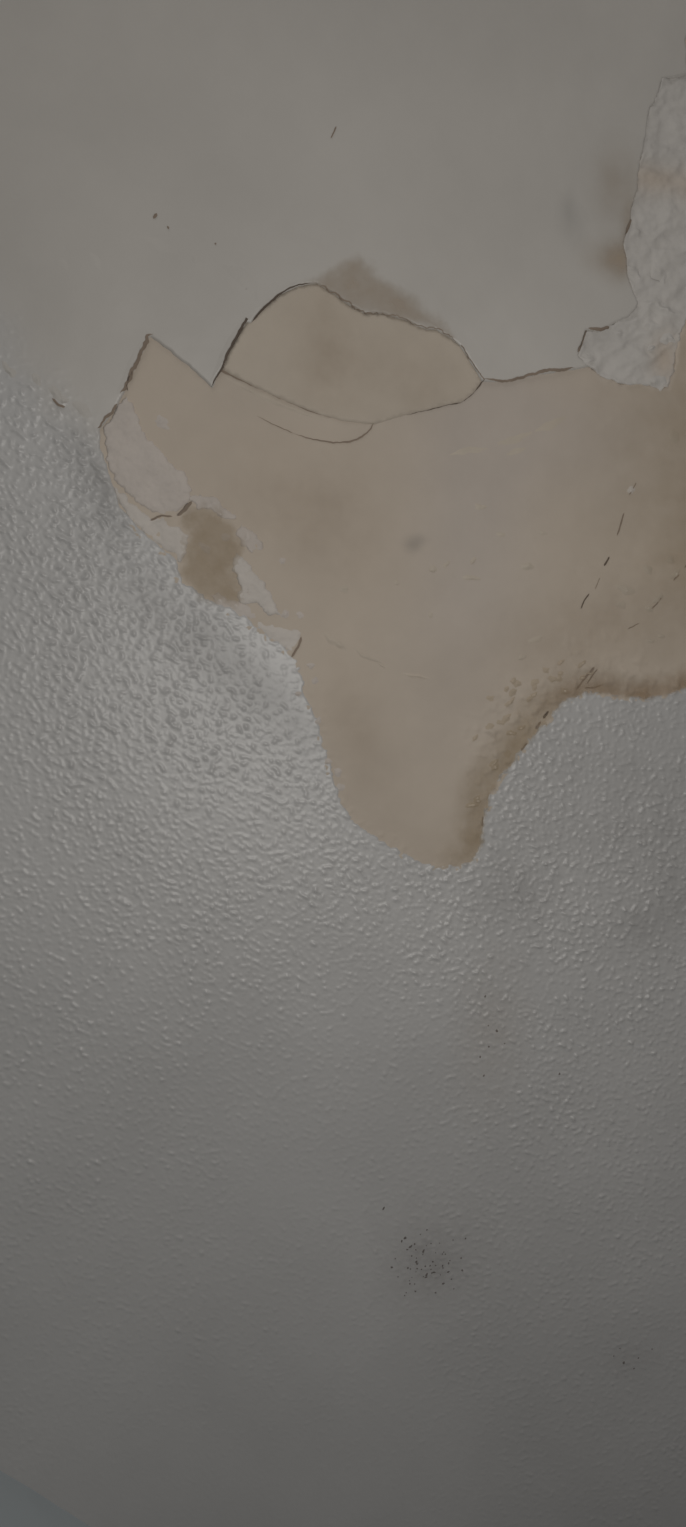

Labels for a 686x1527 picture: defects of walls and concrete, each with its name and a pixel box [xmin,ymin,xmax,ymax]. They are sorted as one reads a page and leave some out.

crack [98,330,152,428]
crack [210,280,573,444]
peeling [100,75,686,871]